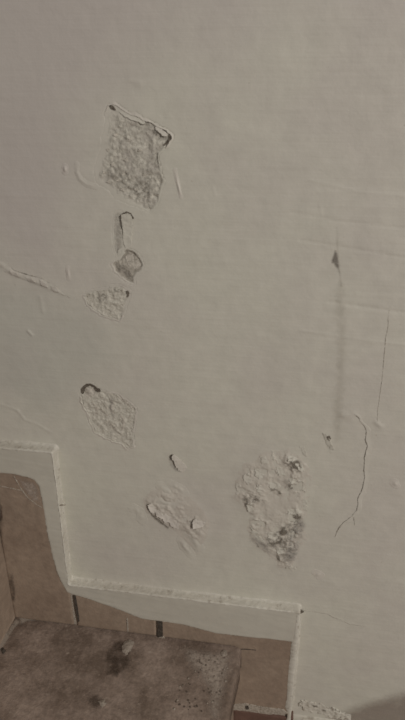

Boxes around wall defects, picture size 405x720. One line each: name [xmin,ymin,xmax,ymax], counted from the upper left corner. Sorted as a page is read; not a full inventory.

spalling [0,101,174,323]
spalling [79,382,138,451]
crack [335,320,389,538]